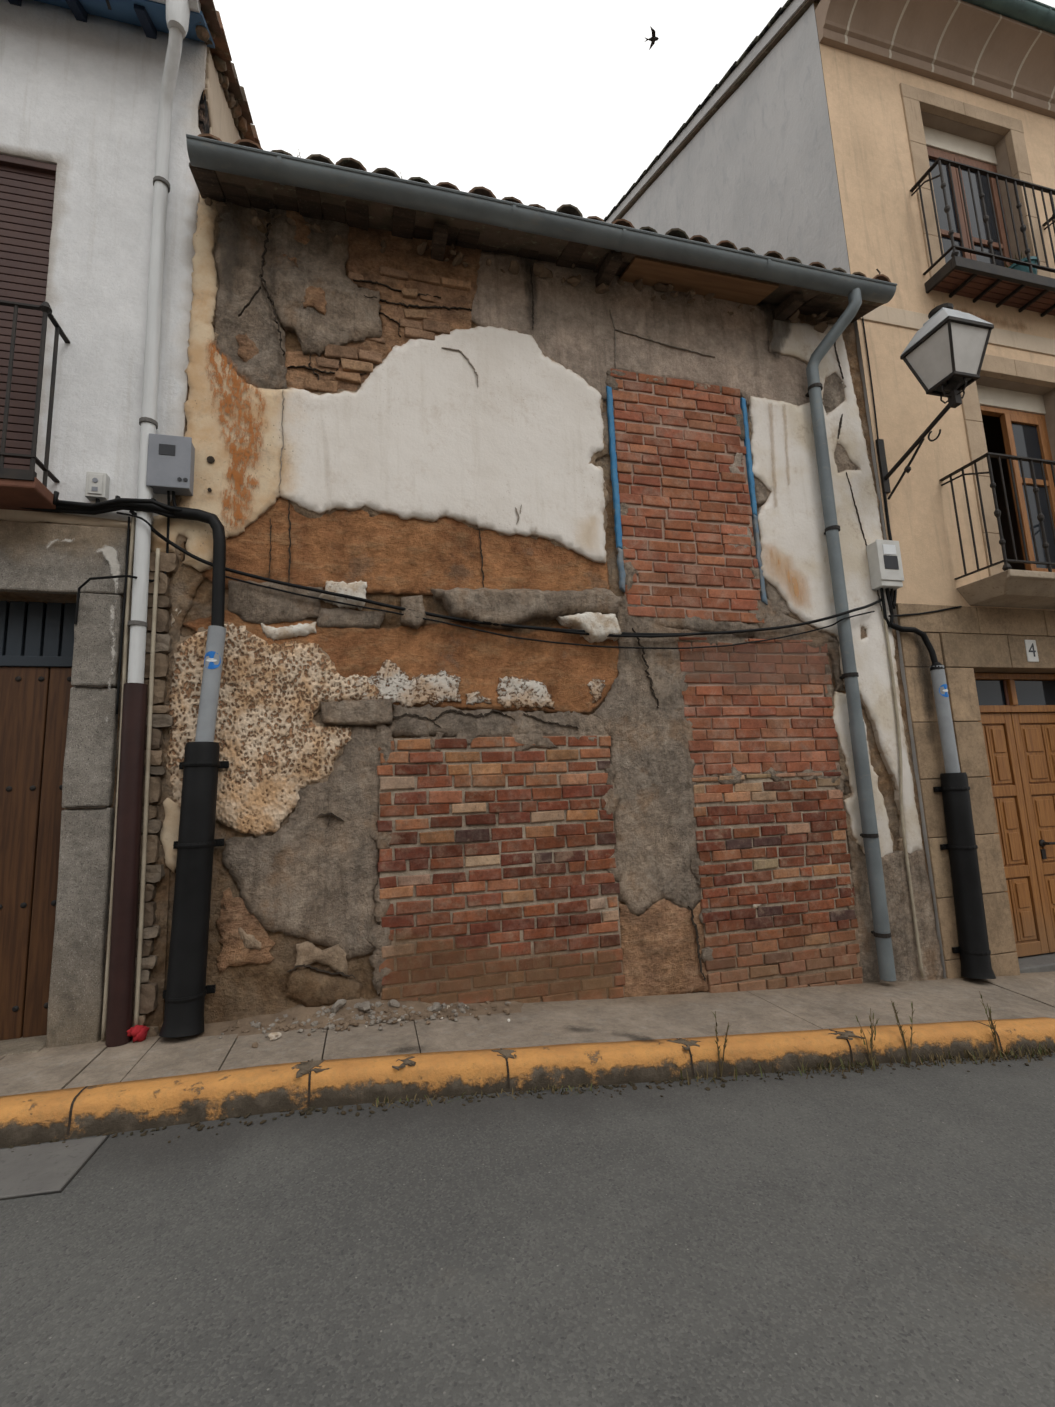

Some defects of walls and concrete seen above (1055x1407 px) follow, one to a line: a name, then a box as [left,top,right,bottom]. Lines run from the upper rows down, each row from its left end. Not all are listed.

crack [238,222,285,356]
flaking render [100,193,715,1040]
crack [632,628,659,708]
flaking render [727,309,925,857]
peeling [491,1049,517,1059]
peeling [667,1038,701,1050]